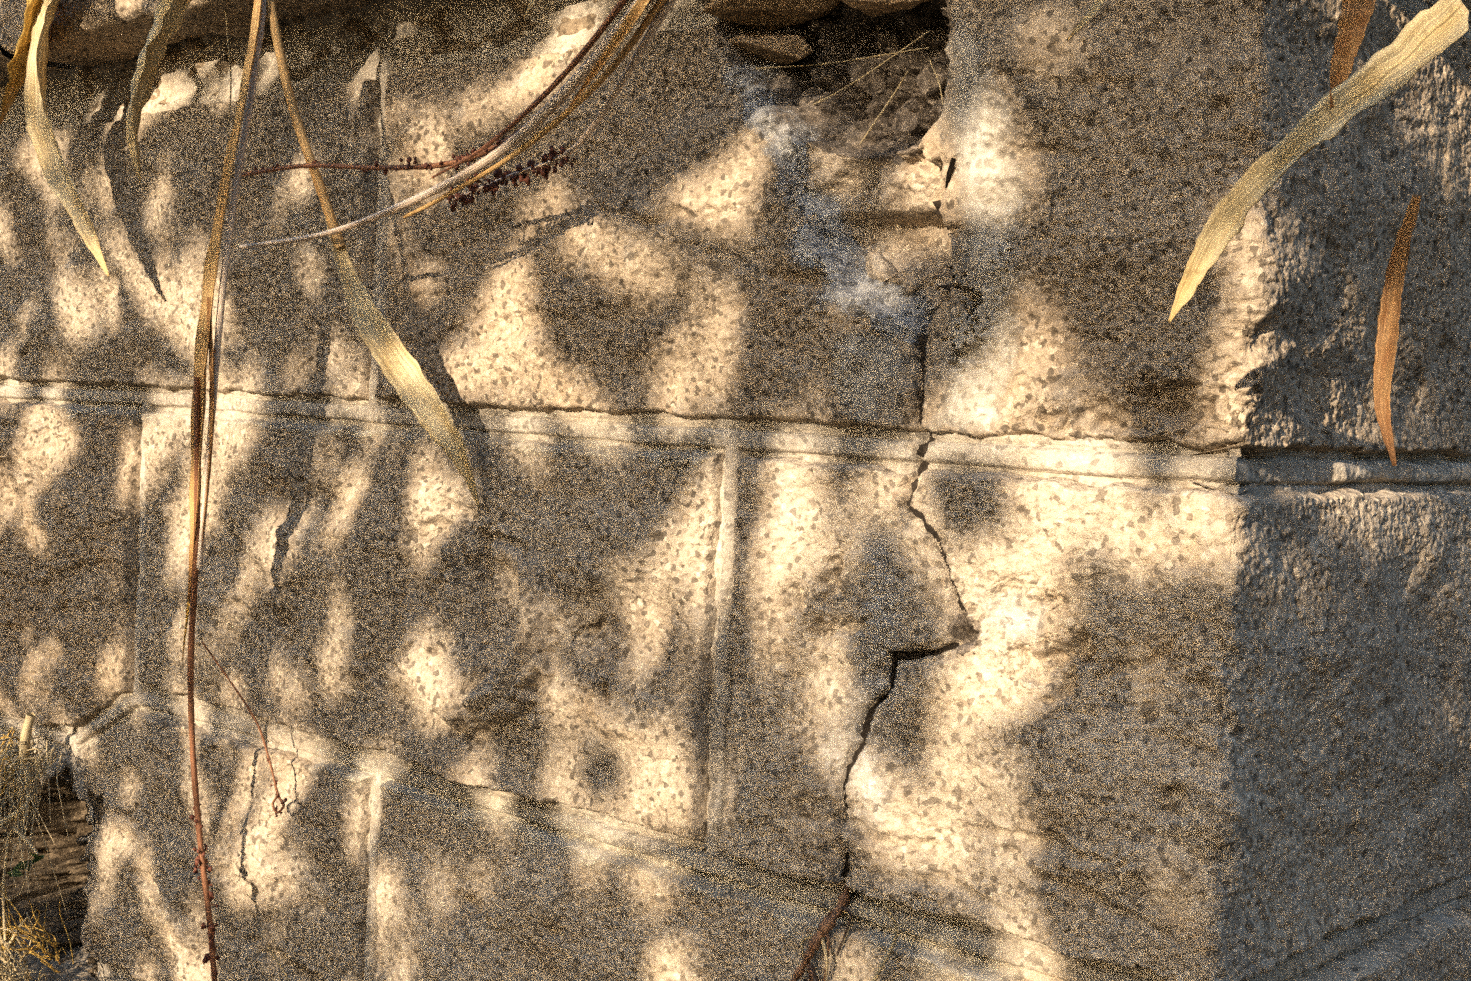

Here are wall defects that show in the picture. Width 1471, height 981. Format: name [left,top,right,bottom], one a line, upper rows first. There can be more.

leakage [722,60,935,423]
spalling [713,0,954,329]
crack [932,158,956,216]
crack [938,266,953,292]
crack [843,334,966,809]
crack [840,851,850,877]